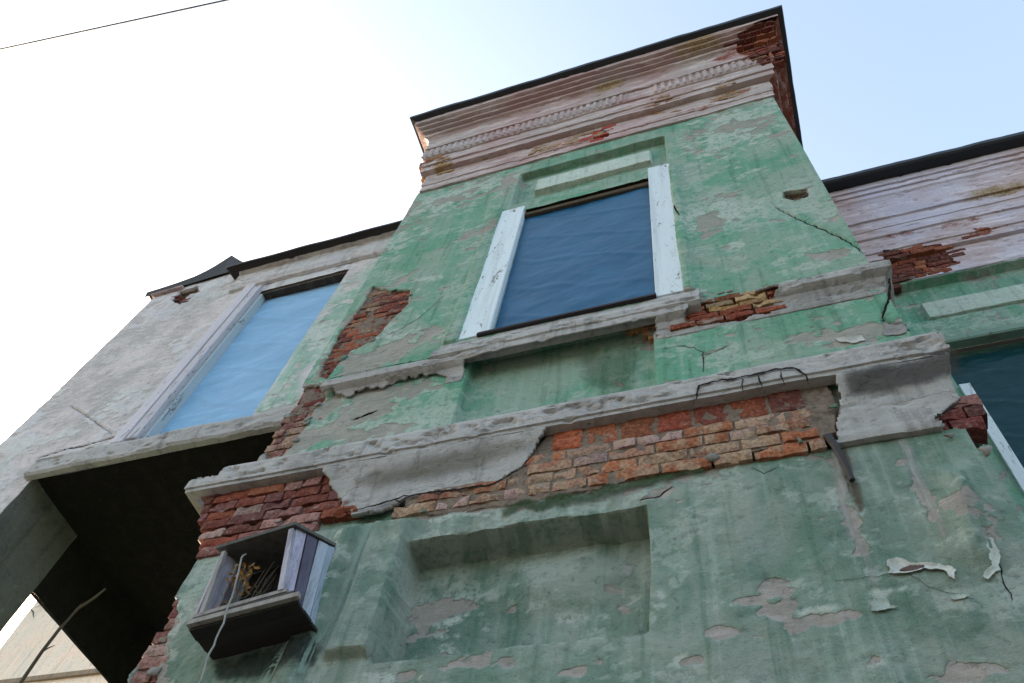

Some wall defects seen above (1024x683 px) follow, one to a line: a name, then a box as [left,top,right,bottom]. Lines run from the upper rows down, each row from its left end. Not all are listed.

spalling [723,20,786,71]
spalling [527,124,617,158]
crack [777,208,864,254]
spalling [871,225,1008,294]
spalling [670,288,787,332]
crack [882,278,910,331]
spalling [264,288,413,459]
crack [671,344,809,400]
spalling [391,389,828,520]
spalling [939,393,993,457]
spalling [196,475,362,560]
spalling [130,599,178,683]